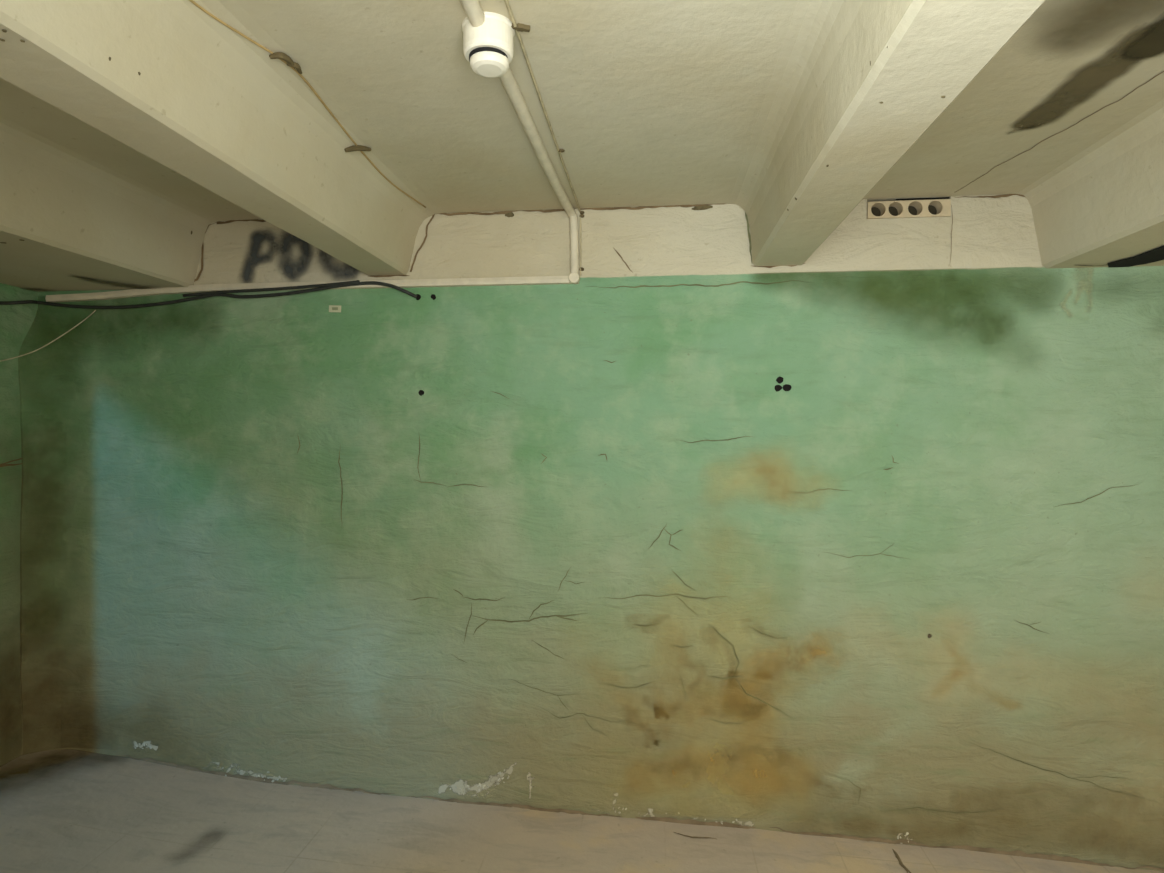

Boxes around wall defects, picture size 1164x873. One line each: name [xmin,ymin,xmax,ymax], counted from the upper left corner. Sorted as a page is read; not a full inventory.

damp [1010,0,1164,133]
damp [856,271,987,319]
crack [407,570,584,663]
crack [607,524,792,724]
crack [508,679,628,735]
damp [0,753,109,789]